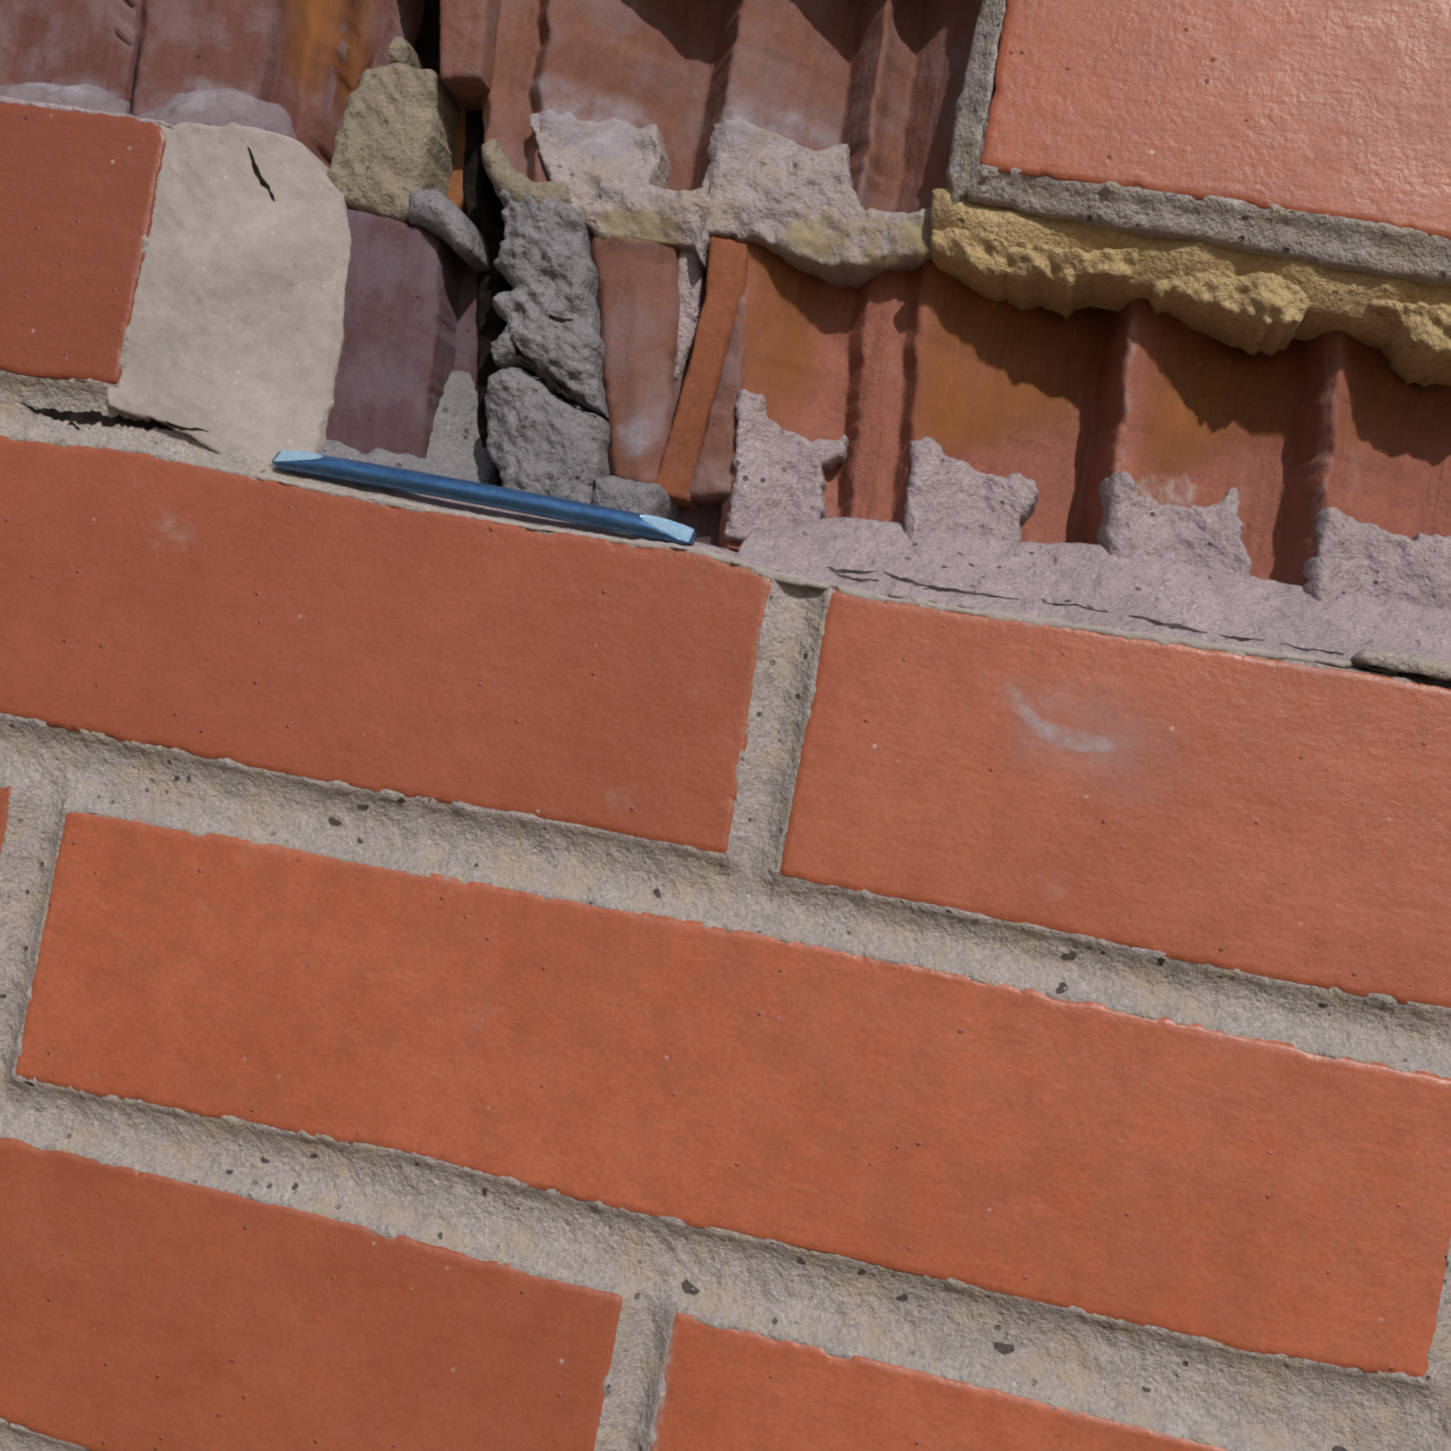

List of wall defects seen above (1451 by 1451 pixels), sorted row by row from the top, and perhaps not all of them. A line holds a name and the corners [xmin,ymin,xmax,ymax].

crack [247,147,275,201]
spalling [0,0,1451,669]
crack [21,402,209,432]
crack [826,567,1451,688]